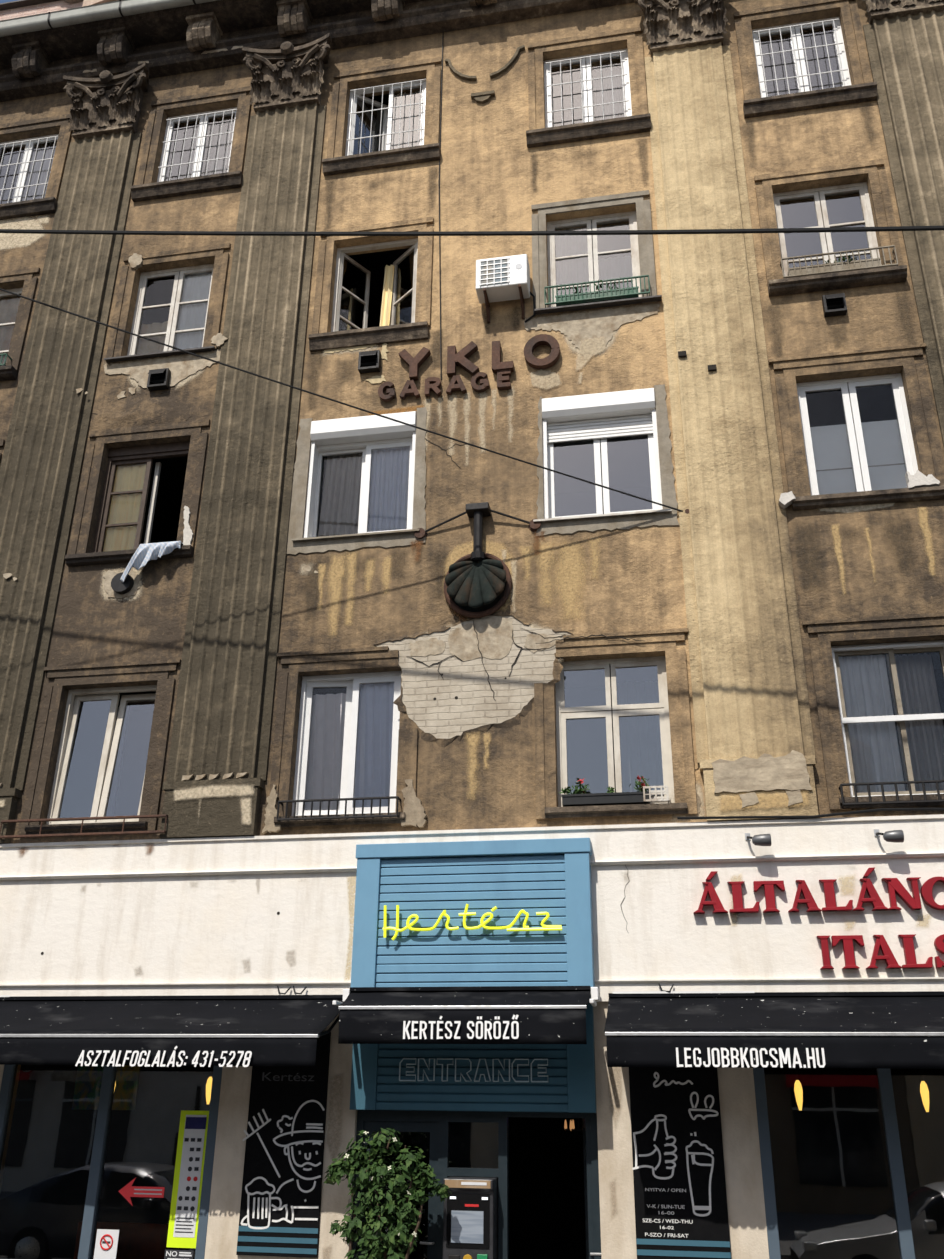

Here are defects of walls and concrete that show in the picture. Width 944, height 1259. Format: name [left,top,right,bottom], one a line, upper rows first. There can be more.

peeling [0,216,49,249]
spalling [128,253,143,270]
spalling [104,333,228,399]
peeling [530,369,560,388]
peeling [577,337,606,383]
water stain [425,388,514,464]
water stain [445,539,599,617]
spalling [373,609,579,747]
crack [406,620,642,701]